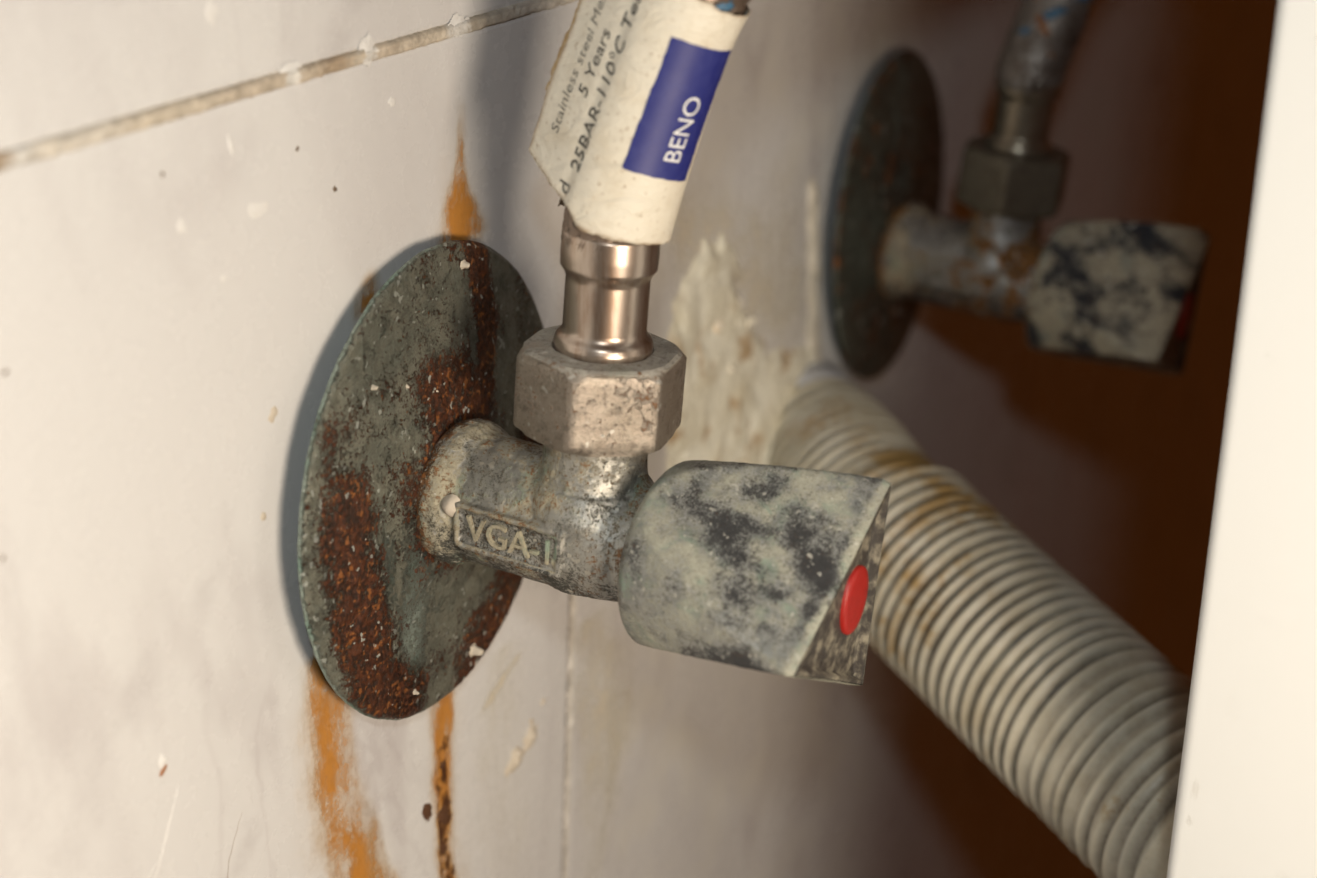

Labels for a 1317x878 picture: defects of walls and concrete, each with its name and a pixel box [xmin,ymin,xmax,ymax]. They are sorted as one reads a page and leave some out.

rust [444,142,481,242]
rust [310,657,384,878]
rust [422,692,455,878]